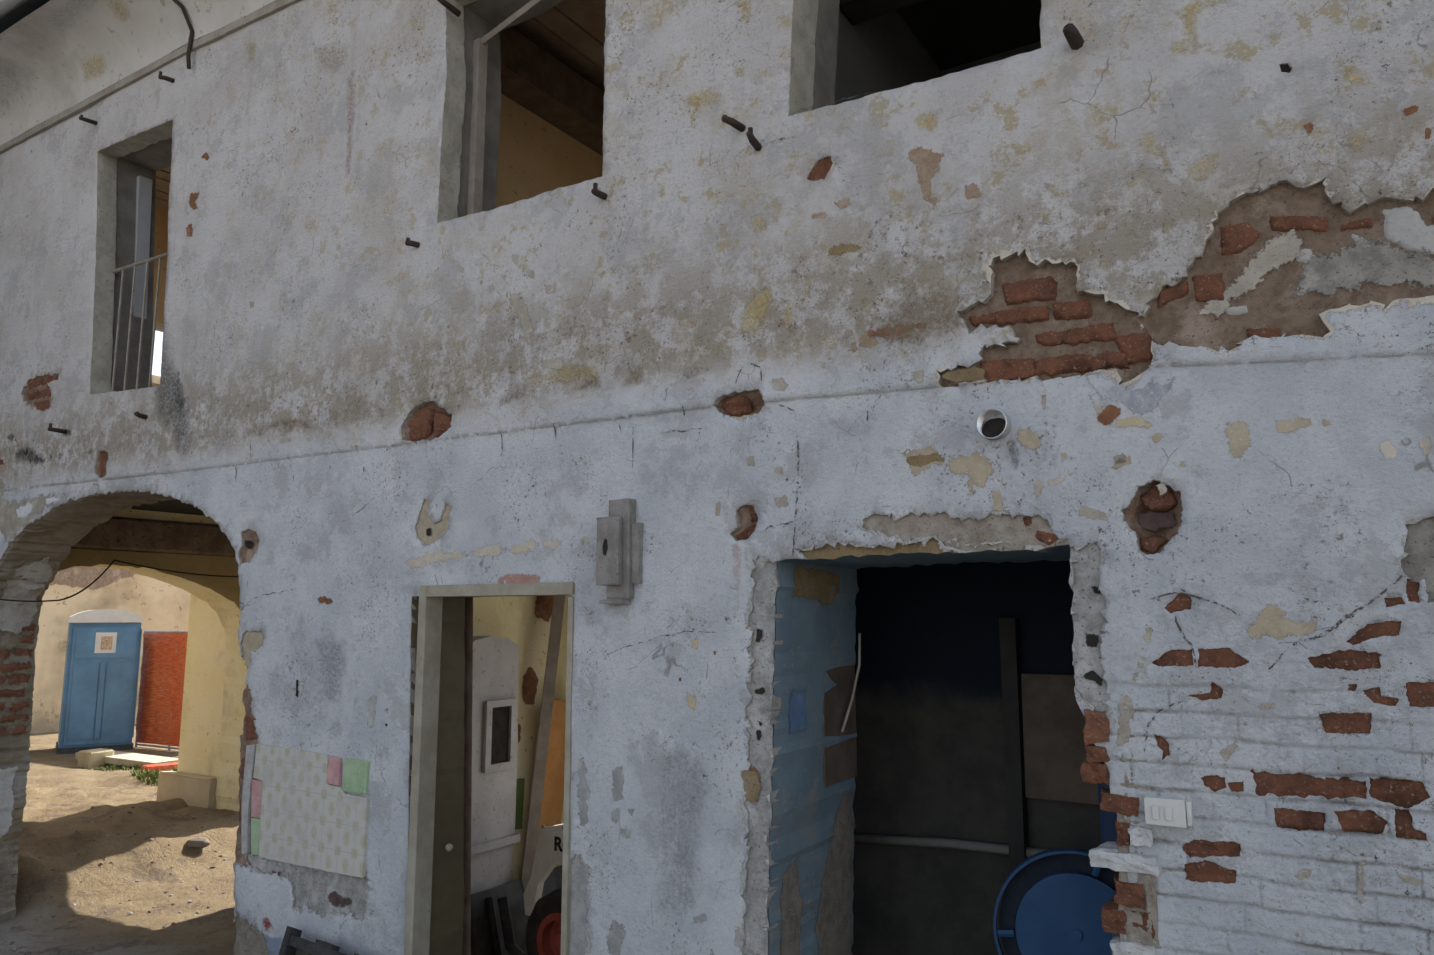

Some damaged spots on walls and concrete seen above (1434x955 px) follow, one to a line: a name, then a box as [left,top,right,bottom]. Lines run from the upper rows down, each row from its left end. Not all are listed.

spalling [807,155,834,182]
peeling [907,147,945,210]
spalling [912,172,1434,443]
spalling [400,385,452,444]
spalling [717,378,788,420]
spalling [715,502,759,541]
peeling [0,556,135,736]
peeling [1247,604,1317,640]
spalling [1308,517,1434,740]
spalling [734,445,1249,955]
peeling [0,766,19,838]
flaking render [1201,742,1430,841]